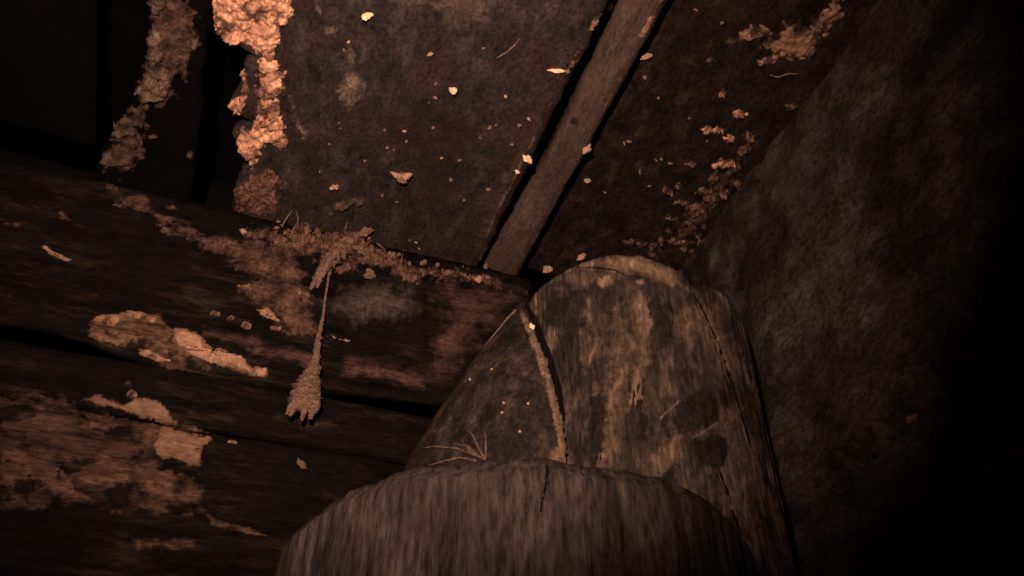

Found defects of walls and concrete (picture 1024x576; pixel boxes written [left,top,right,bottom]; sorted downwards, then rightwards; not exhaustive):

flaking render [0,381,266,536]
flaking render [87,310,268,379]
crack [485,305,568,512]
flaking render [136,539,194,555]